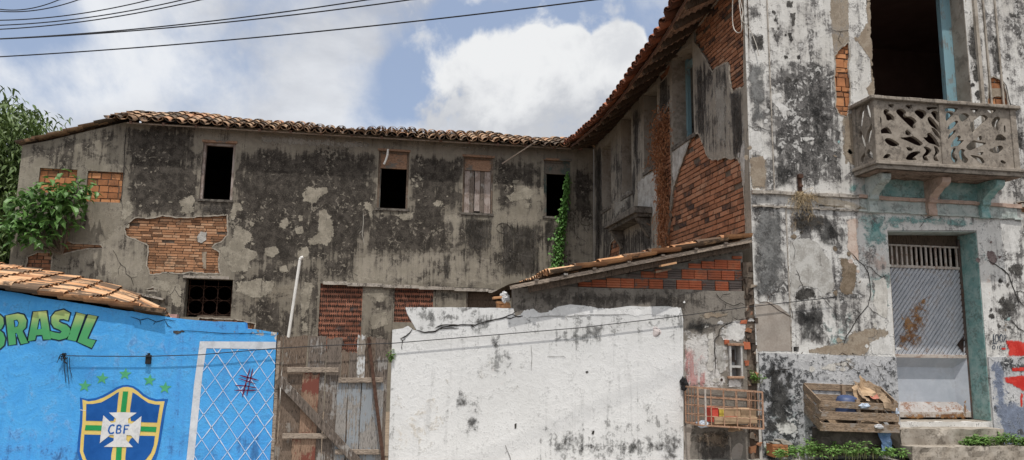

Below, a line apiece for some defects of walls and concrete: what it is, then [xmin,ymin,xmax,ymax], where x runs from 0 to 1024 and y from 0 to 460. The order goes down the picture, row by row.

flaking render [834,0,875,165]
leakage [803,88,832,147]
flaking render [638,105,769,247]
leakage [776,166,793,186]
flaking render [119,186,340,307]
leakage [423,254,455,278]
leakage [465,218,553,277]
leakage [754,209,841,295]
peeling [789,214,901,373]
corrosion [900,297,930,352]
leakage [767,367,791,430]